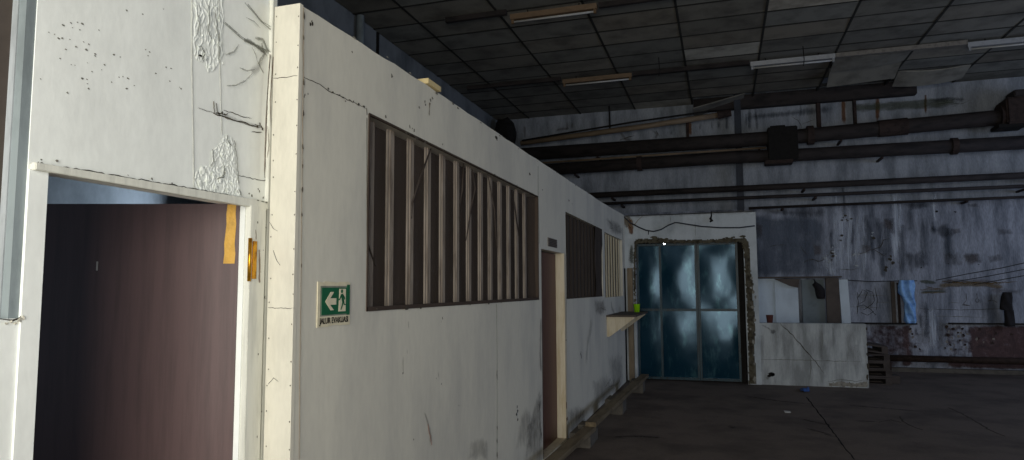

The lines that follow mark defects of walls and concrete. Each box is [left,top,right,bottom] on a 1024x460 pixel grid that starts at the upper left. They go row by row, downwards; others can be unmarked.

damp [756,218,819,274]
peeling [828,326,921,387]
peeling [944,324,1024,369]
crack [782,326,854,459]